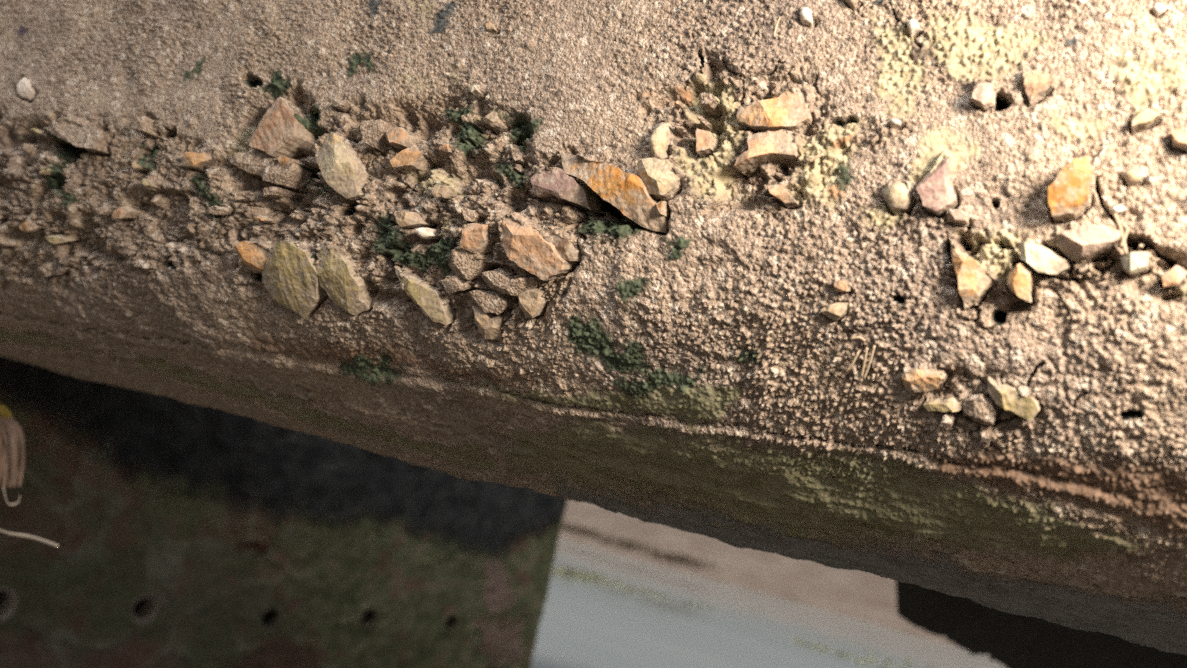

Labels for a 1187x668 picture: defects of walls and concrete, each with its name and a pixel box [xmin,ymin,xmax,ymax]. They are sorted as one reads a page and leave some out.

spalling [0,60,911,344]
spalling [947,224,1187,334]
crack [1096,180,1178,268]
spalling [902,363,1045,448]